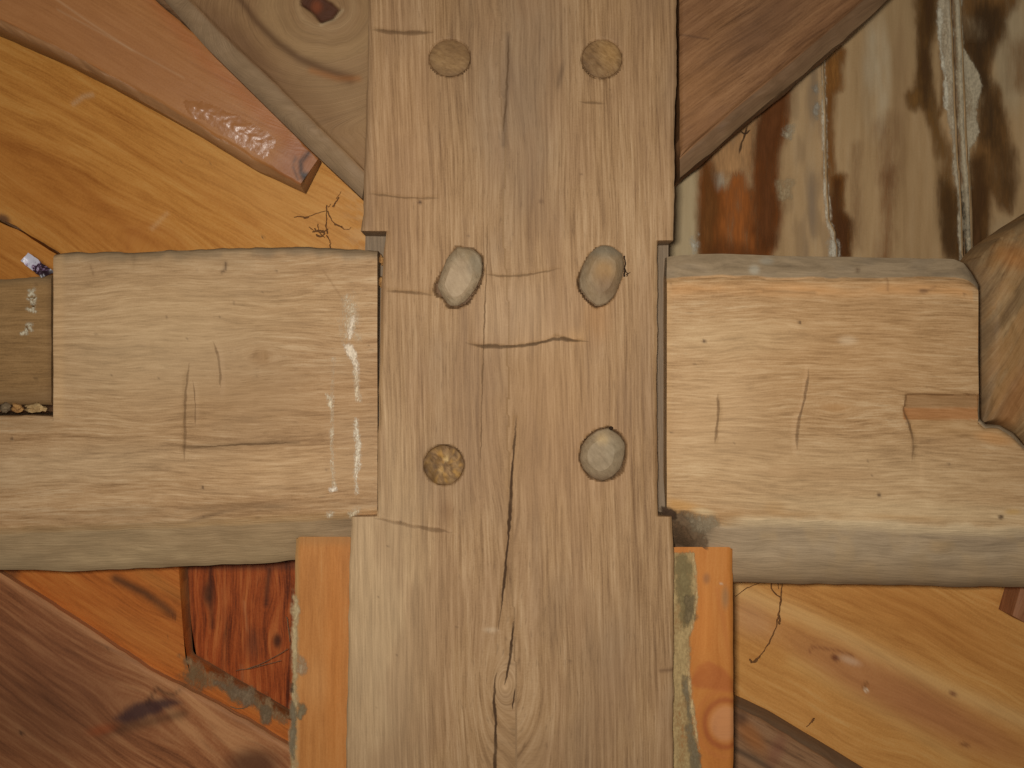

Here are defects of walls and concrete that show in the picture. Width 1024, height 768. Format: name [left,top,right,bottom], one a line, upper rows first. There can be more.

damp [712,123,755,185]
damp [907,0,1016,261]
damp [344,315,361,402]
crack [493,435,516,768]